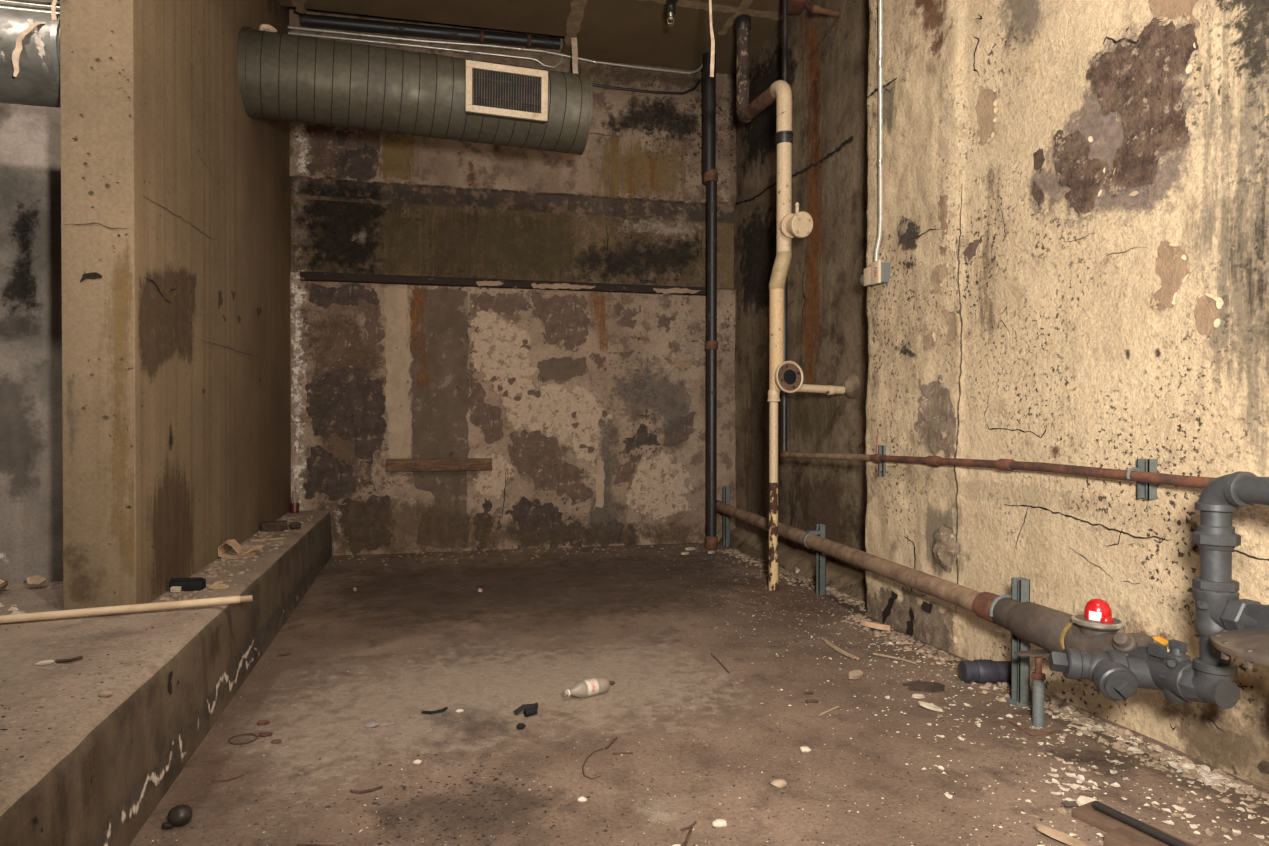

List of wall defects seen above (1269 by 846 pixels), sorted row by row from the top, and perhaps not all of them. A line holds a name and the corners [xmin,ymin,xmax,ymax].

water stain [0,206,38,337]
water stain [113,255,196,570]
water stain [291,124,388,511]
rust [800,19,823,394]
spalling [914,375,957,458]
spalling [1031,0,1200,219]
peeling [1150,241,1191,311]
peeling [1194,293,1224,336]
water stain [1204,0,1269,374]
water stain [98,423,702,846]
crack [1004,504,1172,584]
crack [1232,550,1269,561]